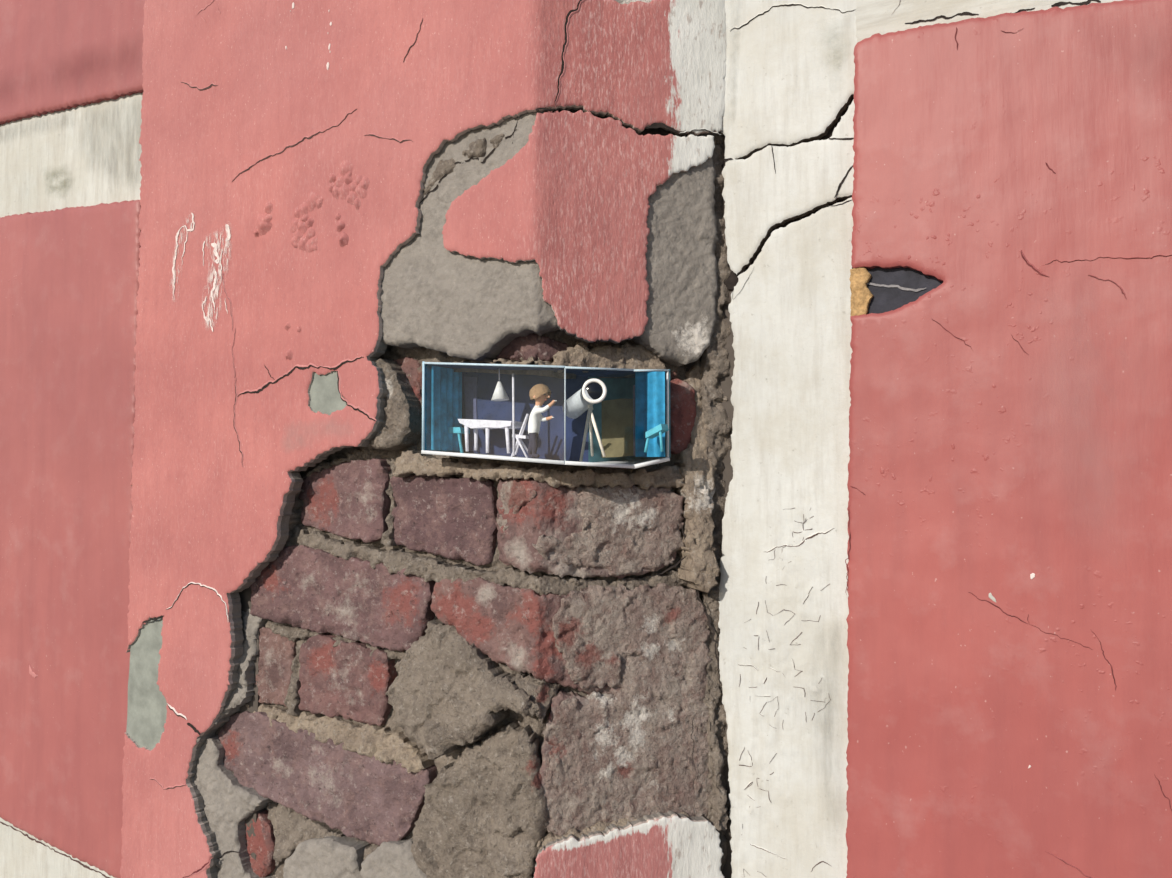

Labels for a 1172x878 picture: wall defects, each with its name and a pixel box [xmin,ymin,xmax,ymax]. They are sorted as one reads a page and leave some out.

crack [730,3,855,31]
crack [892,0,1101,49]
crack [232,109,413,181]
crack [420,0,745,203]
crack [724,98,854,299]
damp [172,213,195,296]
damp [202,224,231,331]
peeling [849,267,943,316]
flaking render [194,110,733,878]
peeling [126,617,167,750]
crack [968,592,1116,690]